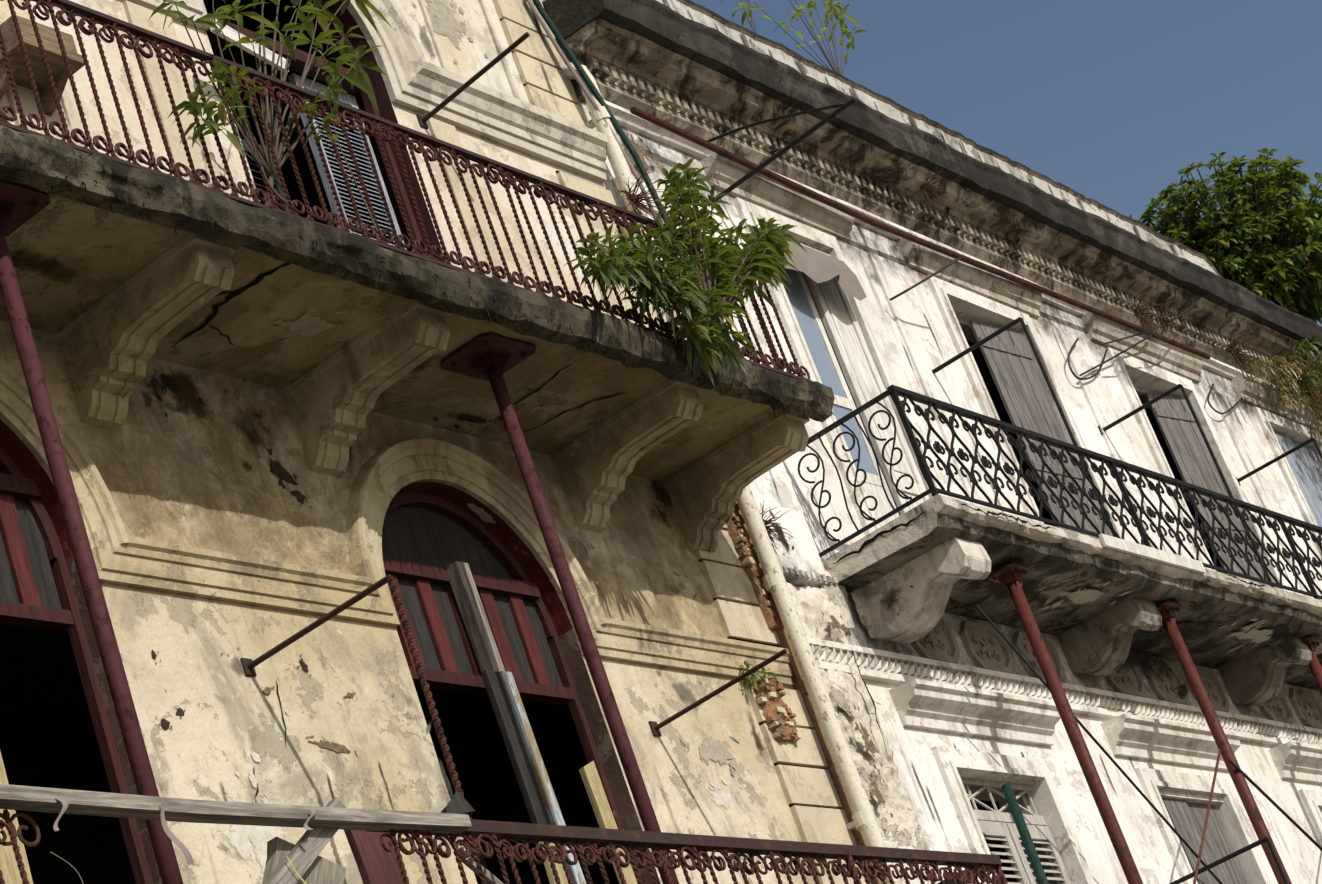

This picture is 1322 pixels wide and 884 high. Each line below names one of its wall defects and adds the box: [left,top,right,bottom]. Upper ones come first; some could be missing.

crack [172,263,290,347]
leakage [143,370,212,424]
crack [513,361,627,432]
flaking render [725,503,784,631]
spalling [822,612,849,636]
peeling [1038,581,1132,612]
peeling [1220,619,1274,653]
flaking render [743,675,801,742]
spalling [850,704,893,817]